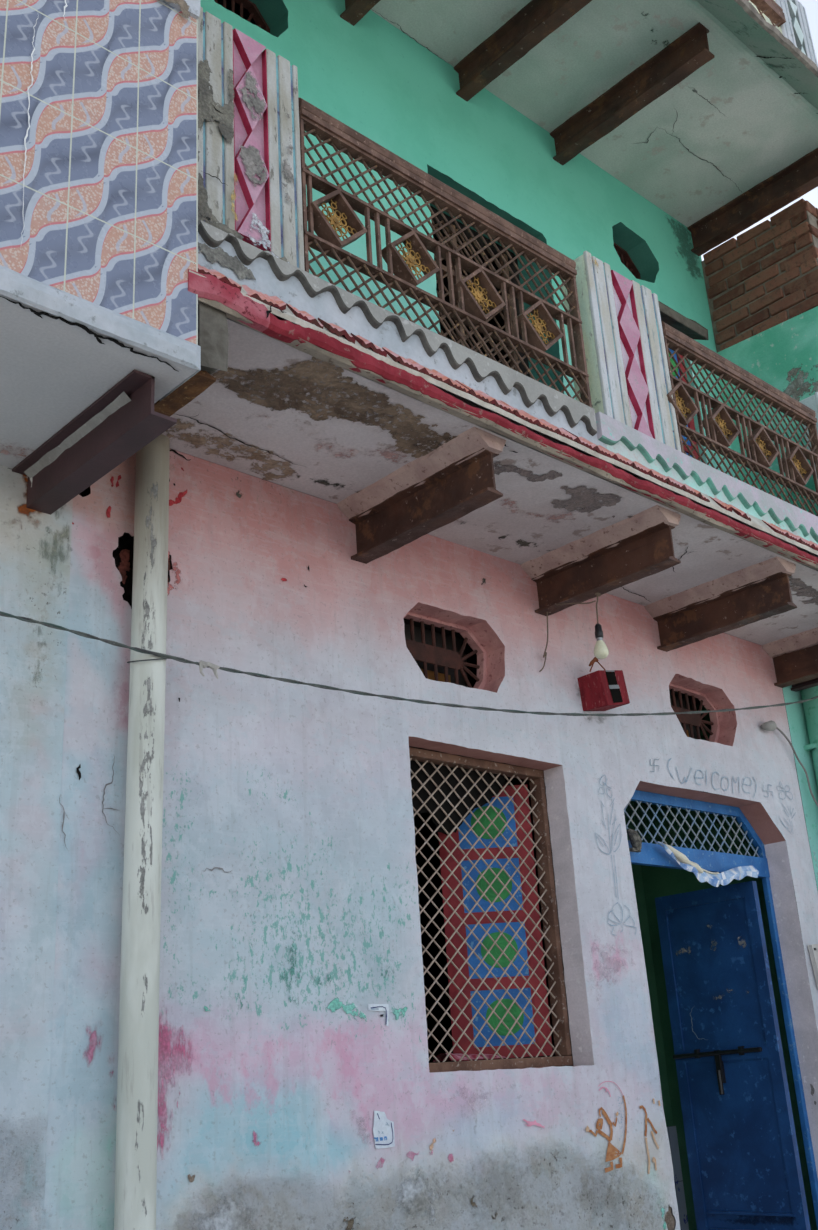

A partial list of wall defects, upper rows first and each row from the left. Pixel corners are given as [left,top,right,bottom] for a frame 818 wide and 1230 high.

flaking render [164,0,190,18]
flaking render [198,59,267,241]
crack [633,87,742,192]
flaking render [198,242,256,280]
peeling [212,357,457,458]
peeling [494,462,634,518]
hole [112,537,133,606]
flaking render [167,552,181,595]
peeling [789,577,818,605]